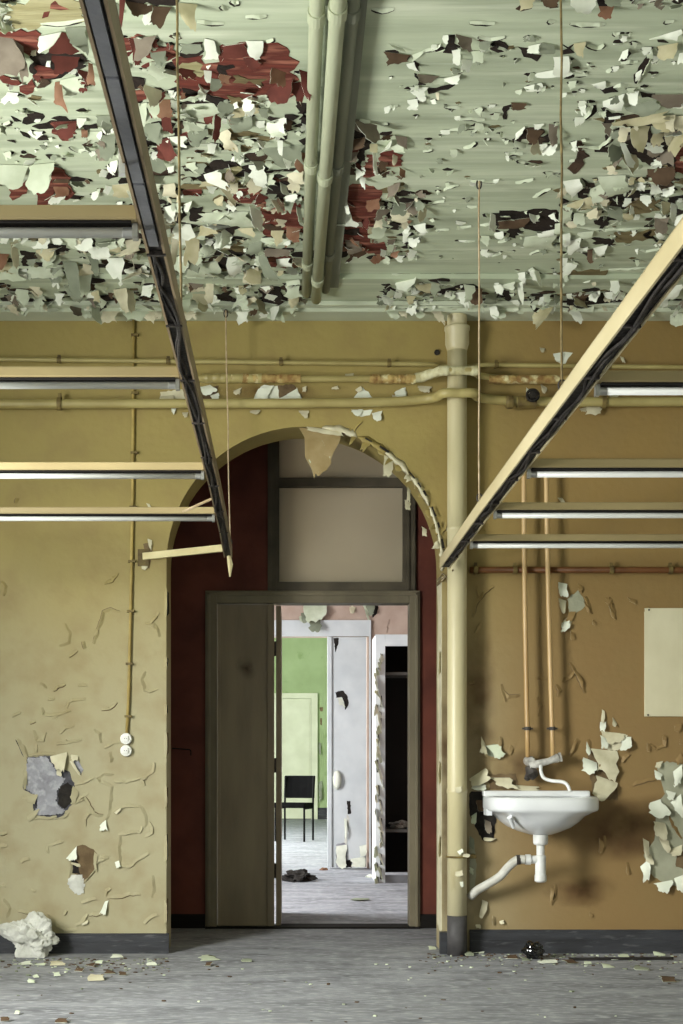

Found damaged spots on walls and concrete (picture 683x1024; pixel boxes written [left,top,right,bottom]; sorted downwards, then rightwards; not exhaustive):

peeling [0,0,133,205]
peeling [116,0,314,325]
peeling [337,0,683,329]
peeling [0,233,162,324]
peeling [345,373,382,421]
peeling [250,384,445,931]
peeling [558,582,596,640]
spalling [16,738,89,822]
spalling [66,845,106,895]
peeling [455,736,539,892]
peeling [569,710,632,801]
peeling [625,724,683,894]